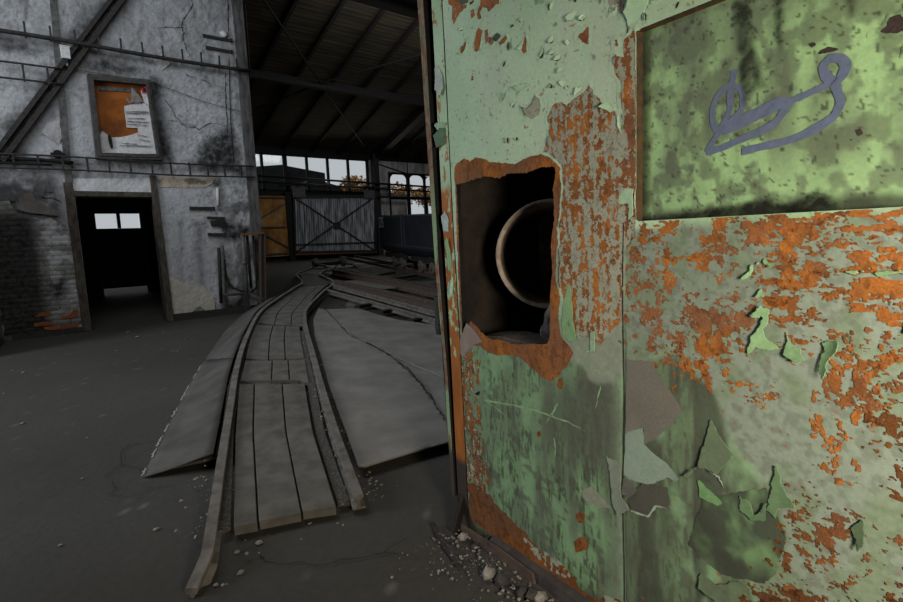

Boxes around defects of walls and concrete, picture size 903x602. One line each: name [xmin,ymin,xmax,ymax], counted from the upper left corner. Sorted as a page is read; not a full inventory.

crack [162,0,228,144]
peeling [447,0,513,50]
peeling [499,80,582,124]
peeling [600,0,648,26]
flaking render [0,186,82,336]
peeling [582,420,795,584]